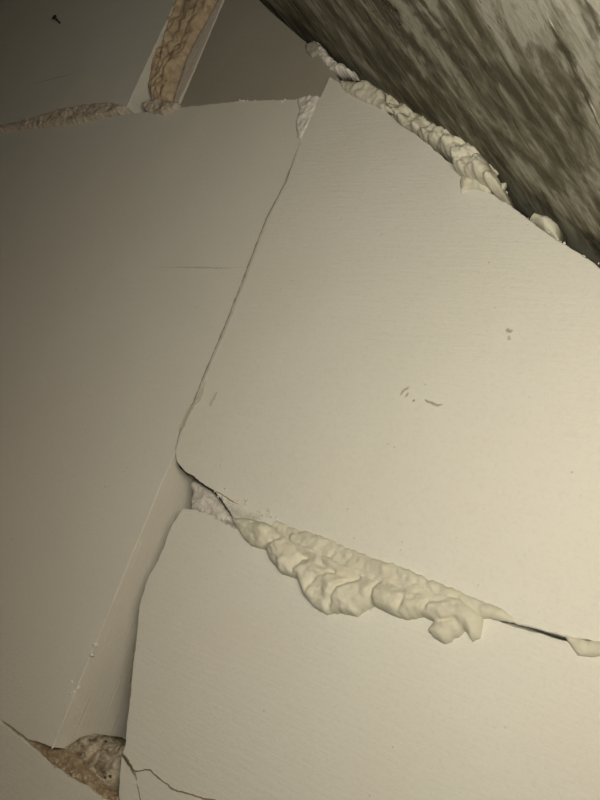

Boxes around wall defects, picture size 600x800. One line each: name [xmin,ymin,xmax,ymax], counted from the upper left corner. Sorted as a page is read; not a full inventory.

water stain [372,0,445,73]
water stain [403,0,498,85]
water stain [537,29,589,103]
water stain [584,0,600,32]
crack [177,159,294,441]
crack [177,463,237,516]
crack [121,753,215,800]